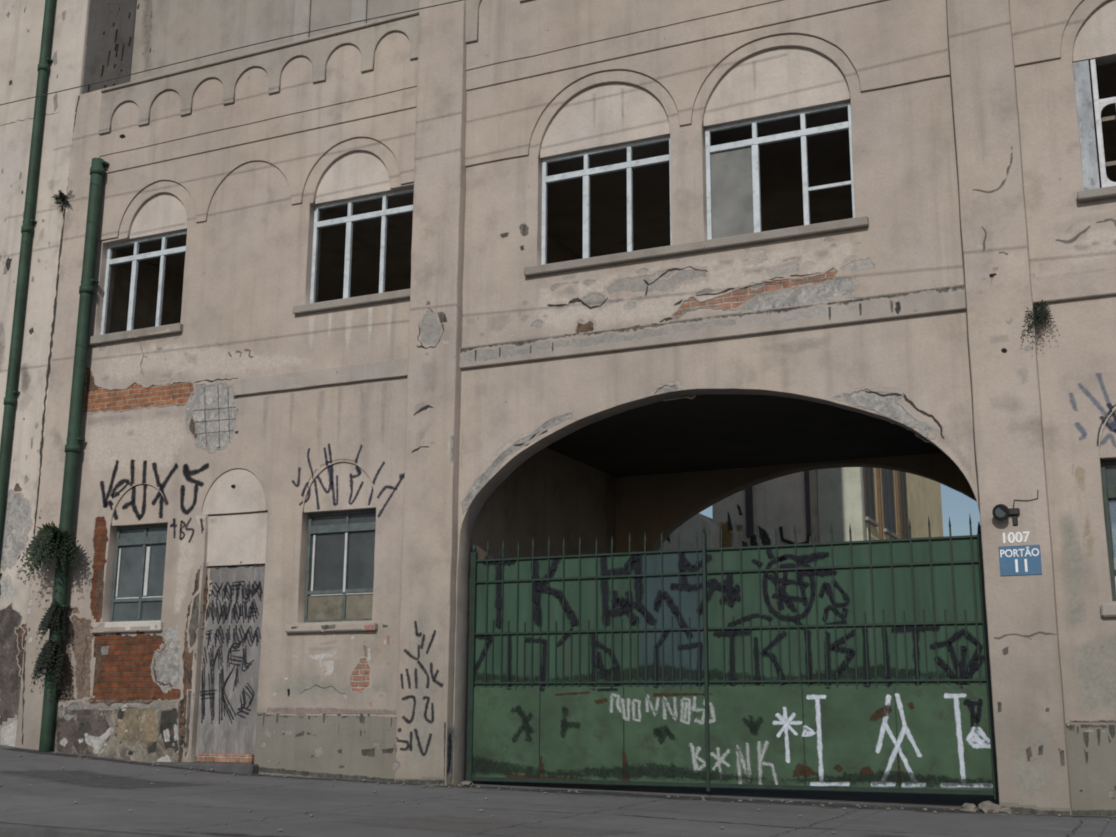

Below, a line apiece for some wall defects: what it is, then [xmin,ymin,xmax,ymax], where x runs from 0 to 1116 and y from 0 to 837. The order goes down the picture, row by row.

peeling [453,235,879,365]
peeling [82,360,244,463]
spalling [825,380,944,443]
flaking render [0,483,51,747]
flaking render [54,509,212,762]
spalling [303,641,373,694]
water stain [995,461,1116,816]